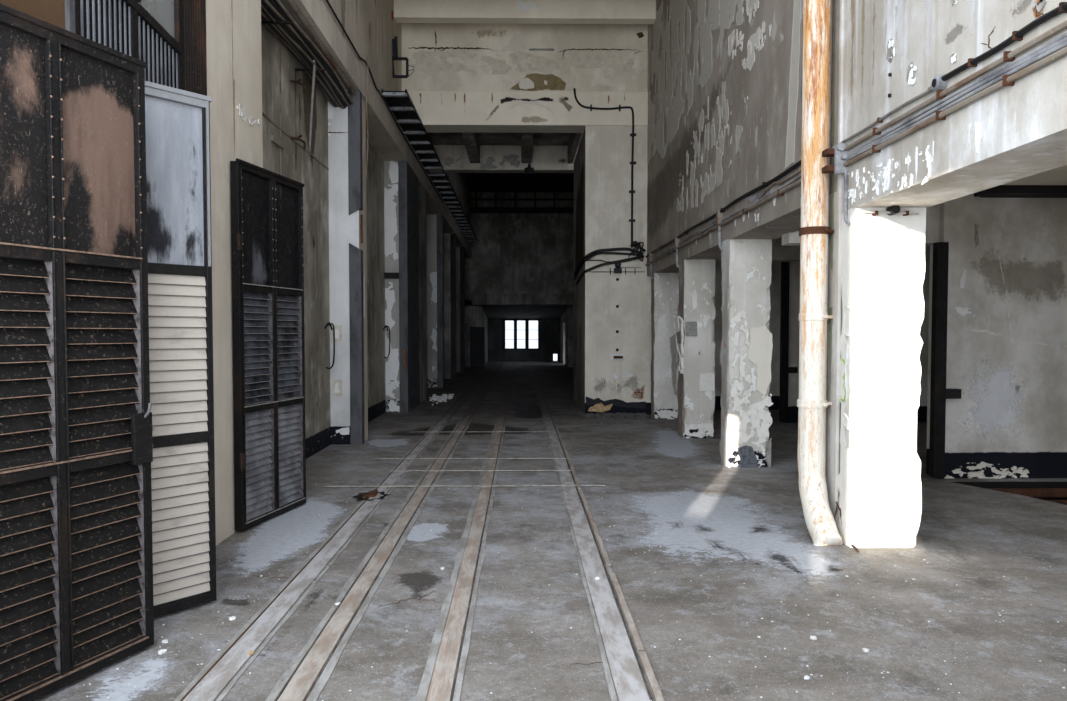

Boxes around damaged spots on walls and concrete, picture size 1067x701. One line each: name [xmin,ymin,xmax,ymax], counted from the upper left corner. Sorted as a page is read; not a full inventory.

peeling [509,51,563,90]
peeling [637,0,772,212]
peeling [785,0,802,169]
peeling [385,282,400,412]
peeling [729,310,773,468]
spalling [944,462,1067,500]